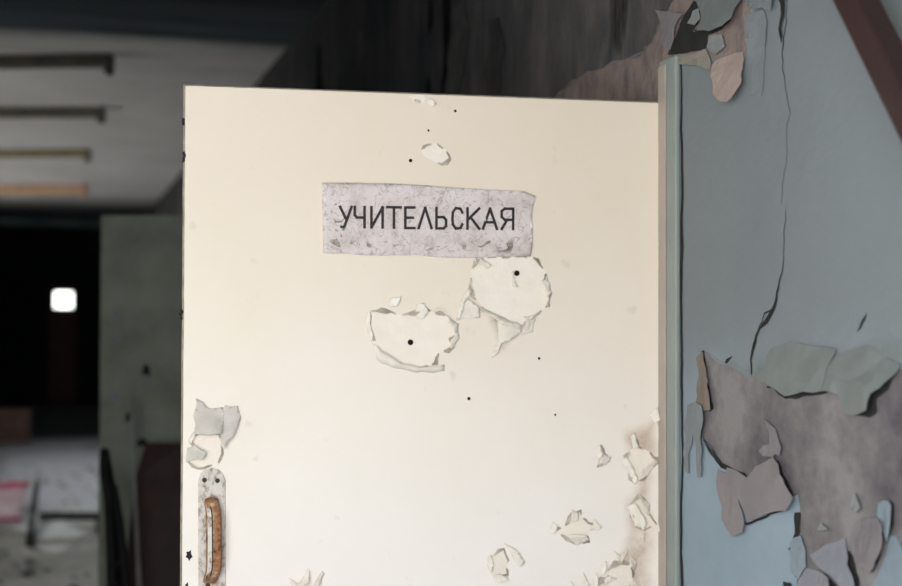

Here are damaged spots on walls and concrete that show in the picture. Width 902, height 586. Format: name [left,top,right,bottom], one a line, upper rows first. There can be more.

peeling [555,0,784,102]
peeling [421,143,452,166]
crack [725,0,791,375]
peeling [366,256,552,373]
peeling [186,399,241,470]
peeling [595,432,660,543]
peeling [650,408,660,439]
peeling [683,341,902,586]
peeling [289,569,324,586]
peeling [487,544,525,582]
peeling [549,509,602,546]
peeling [571,549,639,586]